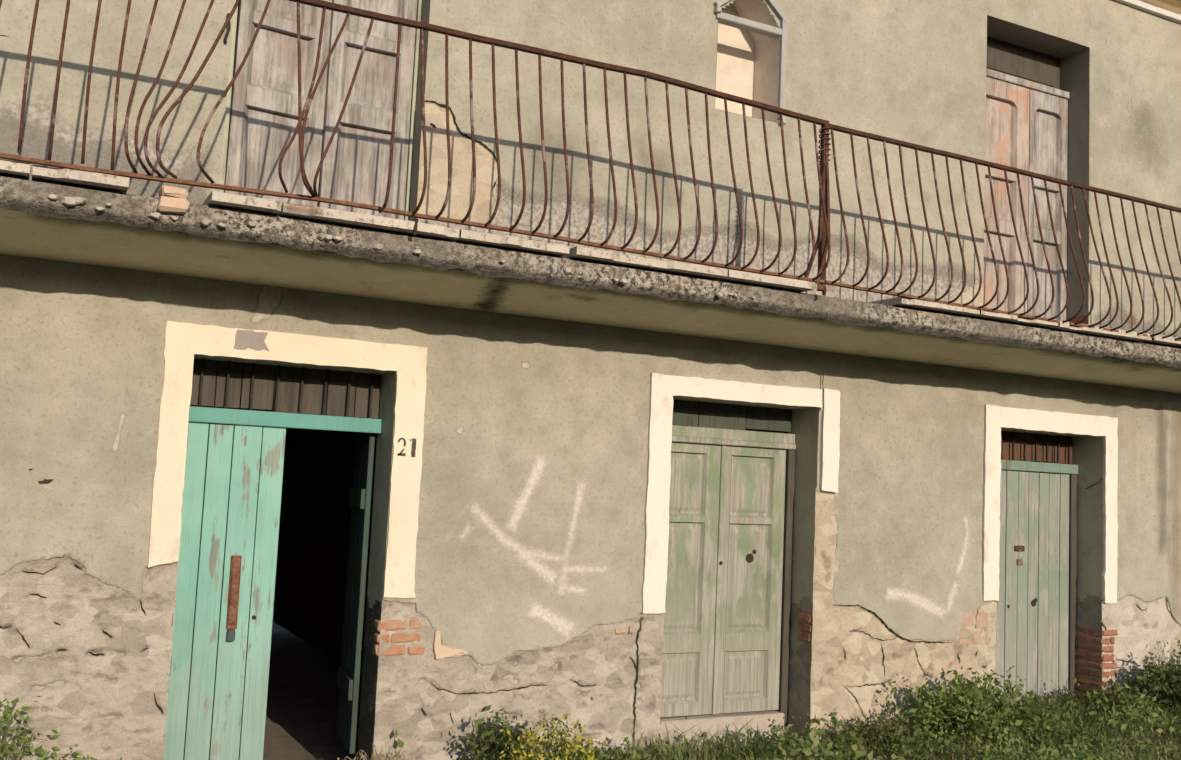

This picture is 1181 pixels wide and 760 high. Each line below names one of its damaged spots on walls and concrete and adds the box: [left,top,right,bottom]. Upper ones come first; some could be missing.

flaking render [417,102,498,223]
spalling [0,176,1181,369]
flaking render [0,557,179,760]
flaking render [373,598,664,760]
flaking render [798,488,997,748]
flaking render [1075,596,1181,710]